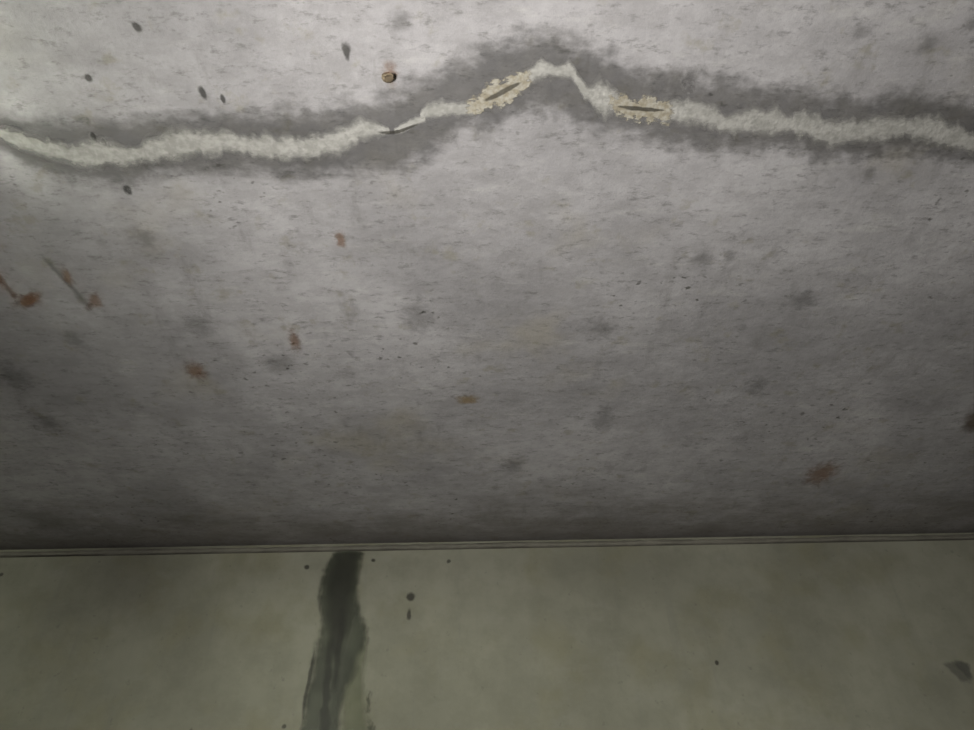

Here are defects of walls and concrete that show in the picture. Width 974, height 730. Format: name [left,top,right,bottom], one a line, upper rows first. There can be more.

crack [0,60,974,166]
damp [301,551,365,730]